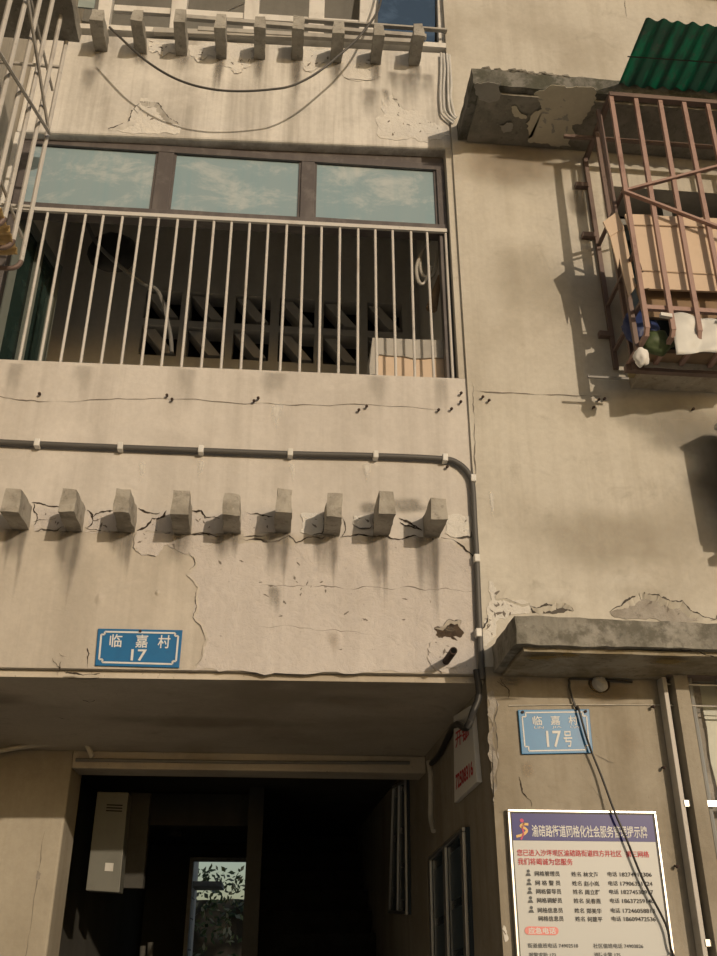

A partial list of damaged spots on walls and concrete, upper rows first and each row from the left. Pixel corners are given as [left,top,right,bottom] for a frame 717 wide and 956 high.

spalling [108,98,181,135]
peeling [499,85,597,147]
crack [32,502,59,525]
crack [87,508,473,557]
flaking render [133,512,574,675]
crack [262,584,472,592]
spalling [610,592,717,624]